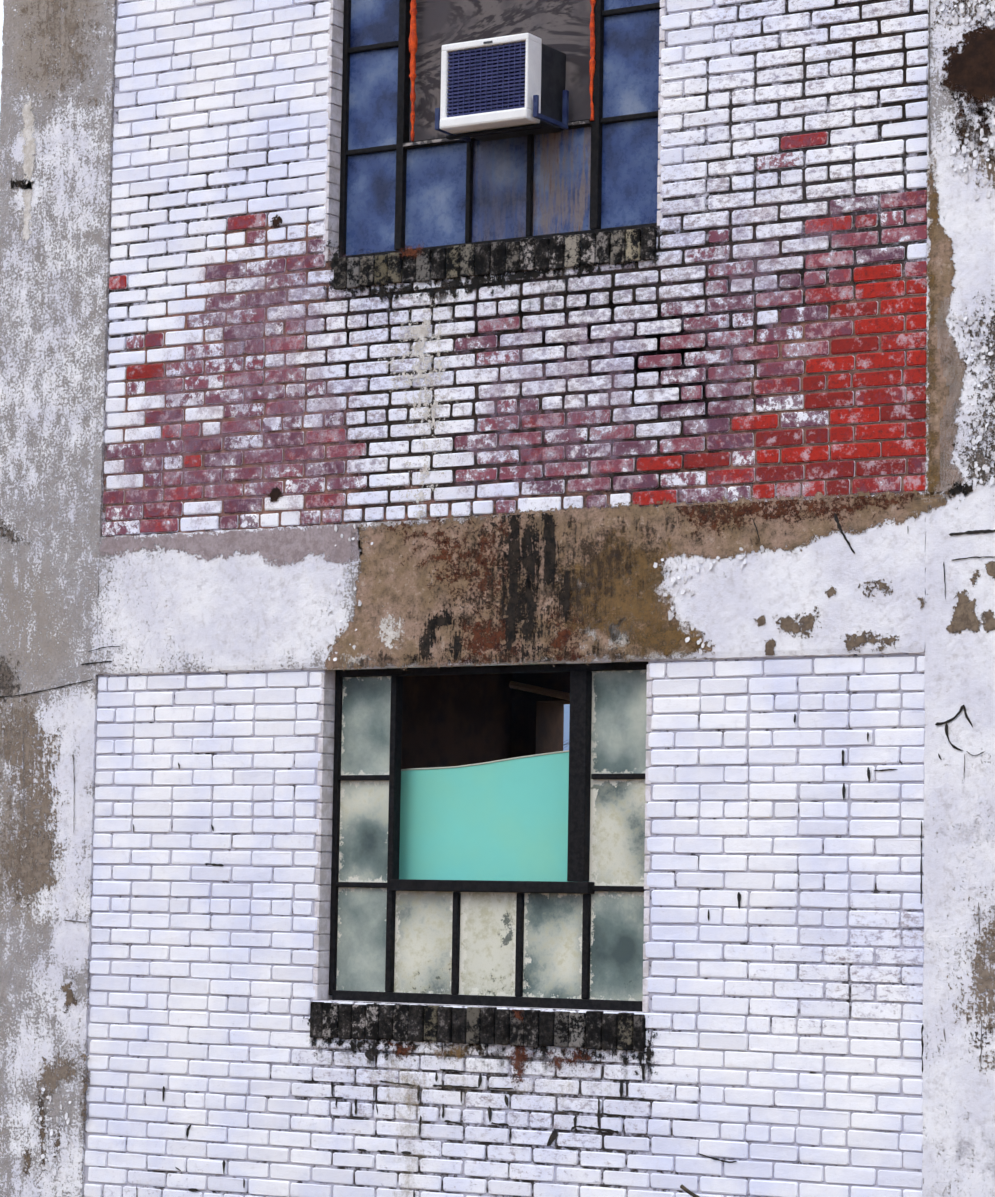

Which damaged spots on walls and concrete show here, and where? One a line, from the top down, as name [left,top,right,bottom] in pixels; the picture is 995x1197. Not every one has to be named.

spalling [828,0,995,153]
crack [925,0,933,154]
peeling [757,132,828,170]
peeling [97,164,969,672]
leakage [0,519,35,546]
leakage [334,506,702,667]
peeling [946,561,995,634]
leakage [0,654,25,708]
crack [935,705,985,773]
crack [917,821,925,903]
crack [921,1024,946,1073]